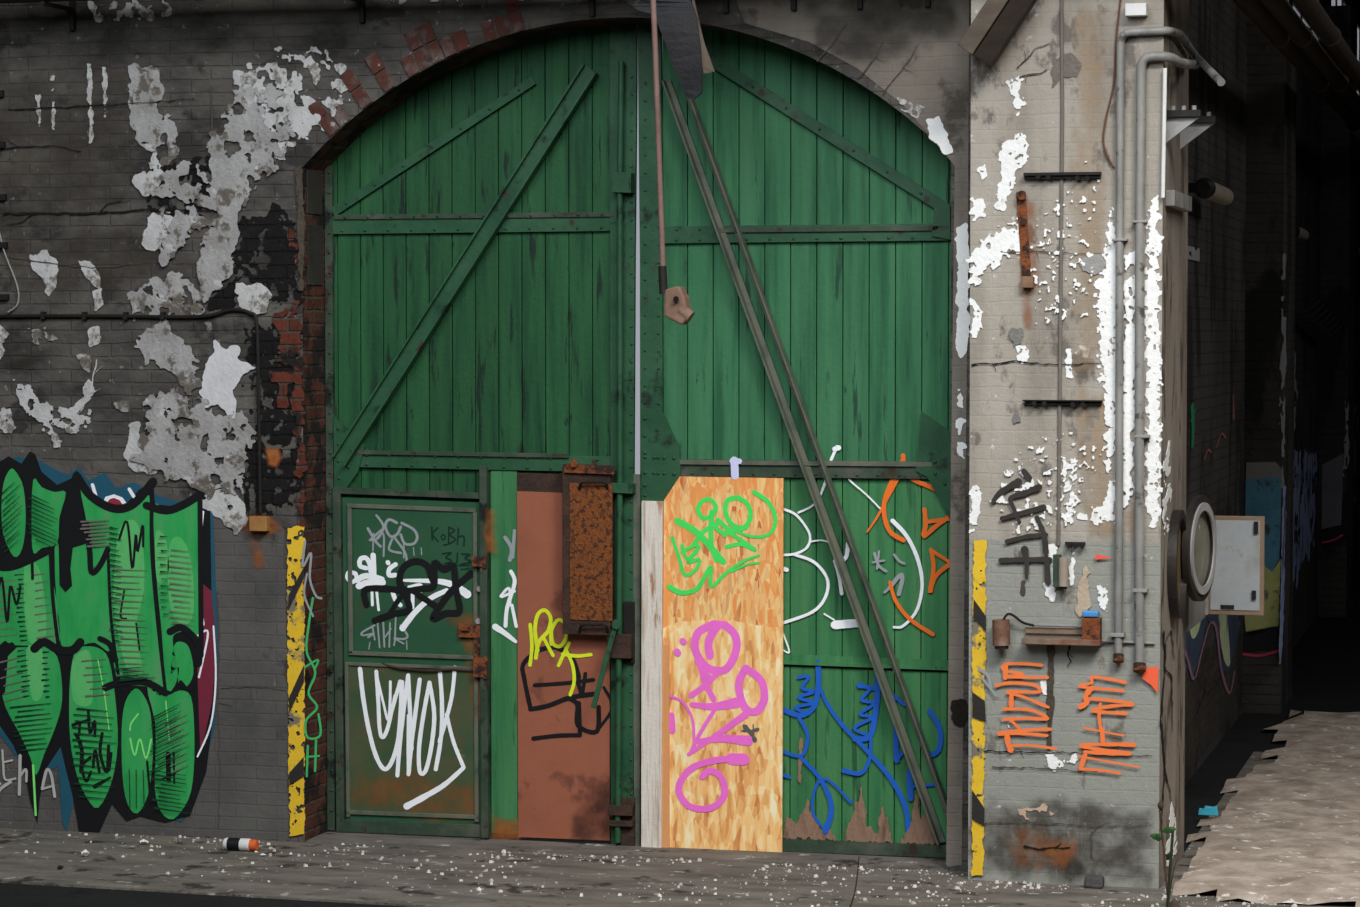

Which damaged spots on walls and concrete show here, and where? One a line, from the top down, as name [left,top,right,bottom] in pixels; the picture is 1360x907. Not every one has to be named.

peeling [1005,76,1026,116]
peeling [29,250,59,296]
peeling [0,261,104,448]
peeling [954,133,1172,535]
spalling [1043,544,1108,617]